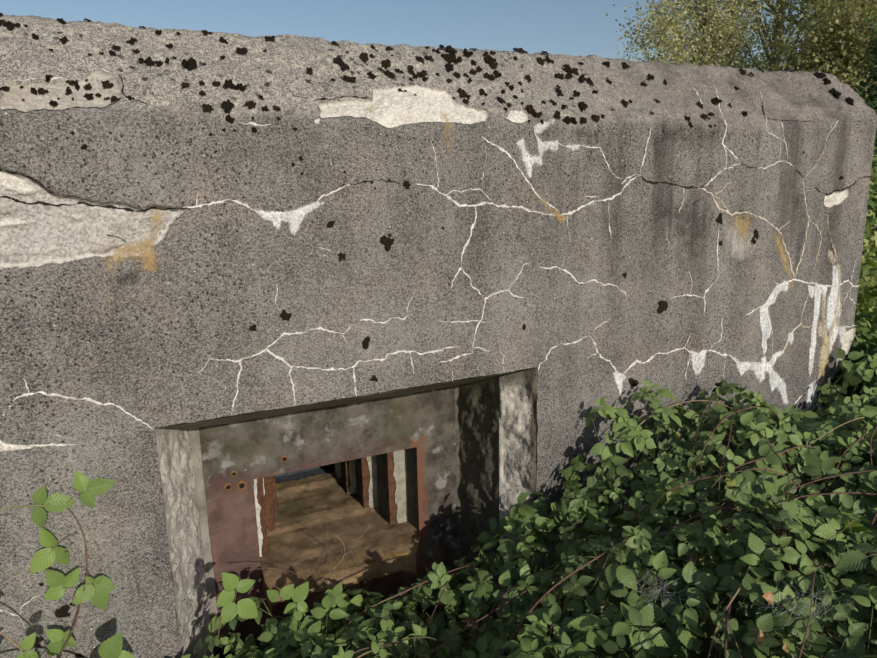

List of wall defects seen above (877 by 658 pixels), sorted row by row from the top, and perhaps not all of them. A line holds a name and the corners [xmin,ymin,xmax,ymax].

spalling [0,70,122,112]
spalling [314,85,489,128]
leakage [517,120,580,177]
spalling [0,168,187,269]
leakage [258,202,324,235]
spalling [823,189,849,208]
crack [0,85,872,414]
leakage [734,282,789,404]
corrosion [818,337,830,385]
leakage [806,250,846,411]
crack [13,380,153,429]
crack [30,435,75,447]